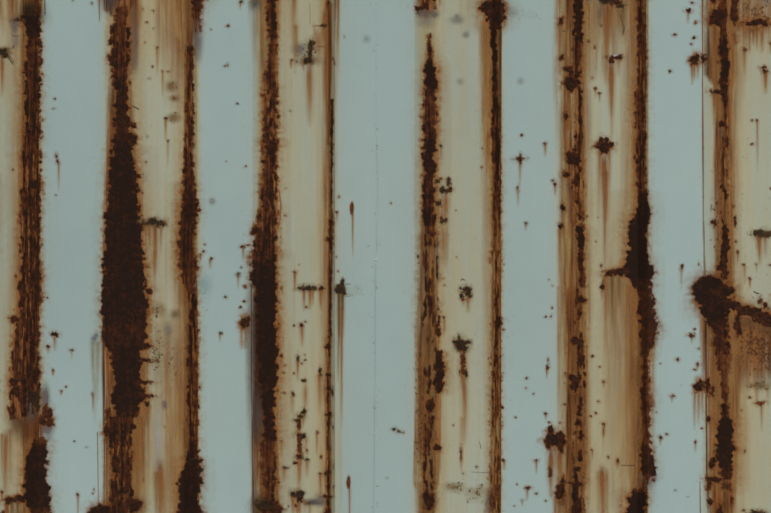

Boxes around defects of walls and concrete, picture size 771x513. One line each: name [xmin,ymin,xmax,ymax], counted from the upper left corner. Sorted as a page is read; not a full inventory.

rust [1,0,58,513]
rust [87,0,154,513]
rust [236,0,306,513]
rust [316,0,340,513]
rust [414,34,449,513]
rust [476,0,508,513]
rust [544,0,601,513]
rust [600,0,668,513]
rust [686,0,771,513]